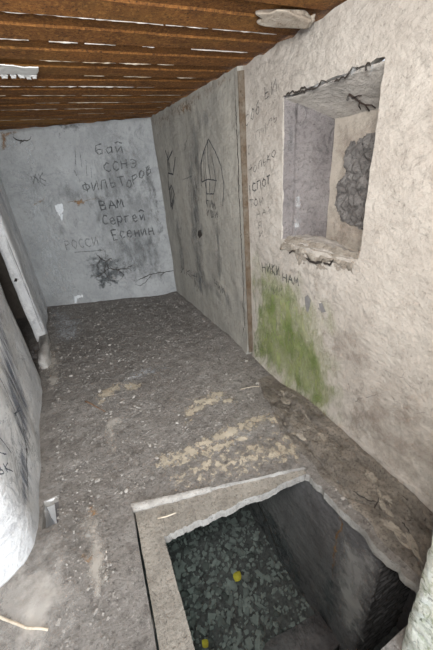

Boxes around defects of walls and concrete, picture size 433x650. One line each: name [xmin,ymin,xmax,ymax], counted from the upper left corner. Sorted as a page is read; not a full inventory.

spalling [284,62,371,97]
spalling [280,224,360,274]
crack [94,254,174,286]